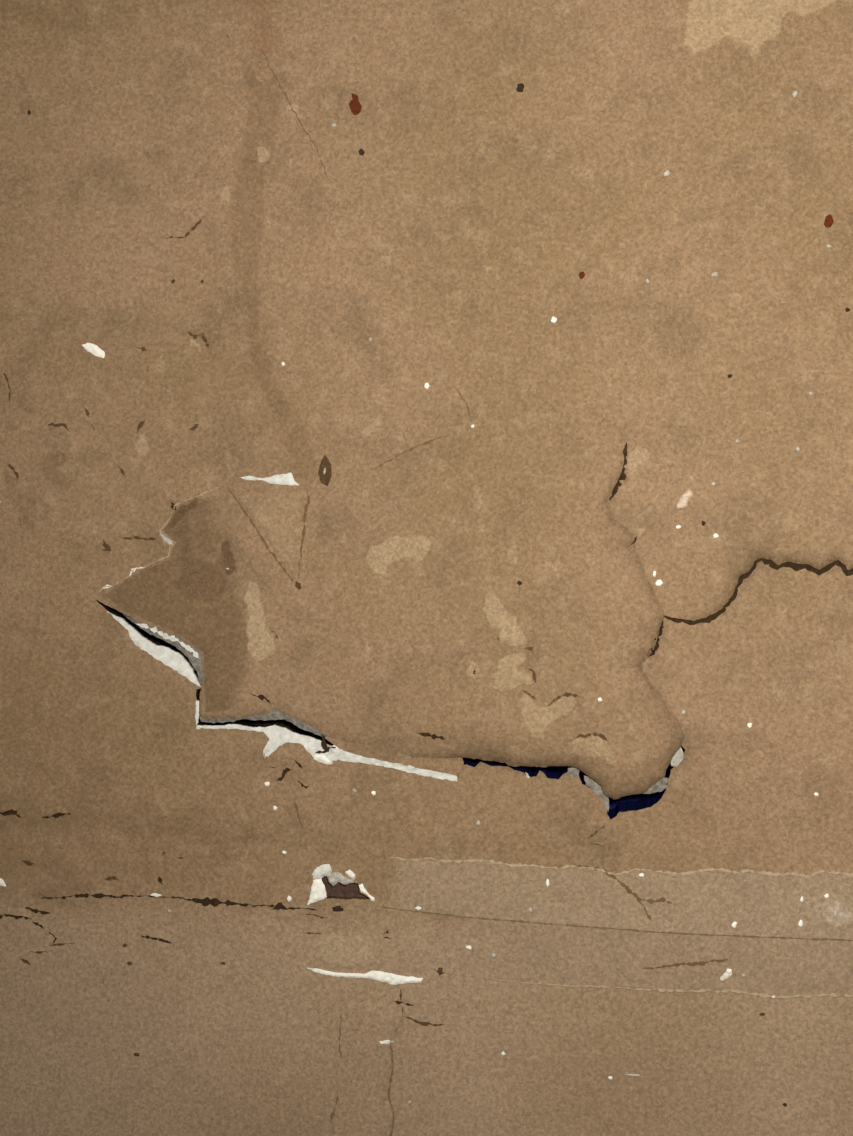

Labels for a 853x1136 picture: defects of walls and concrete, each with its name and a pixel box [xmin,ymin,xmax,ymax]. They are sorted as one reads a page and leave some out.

peeling [681,0,839,65]
peeling [627,445,650,476]
peeling [364,533,432,576]
peeling [243,581,278,664]
peeling [465,589,578,742]
peeling [571,732,620,768]
spalling [345,869,375,902]
peeling [307,968,423,985]